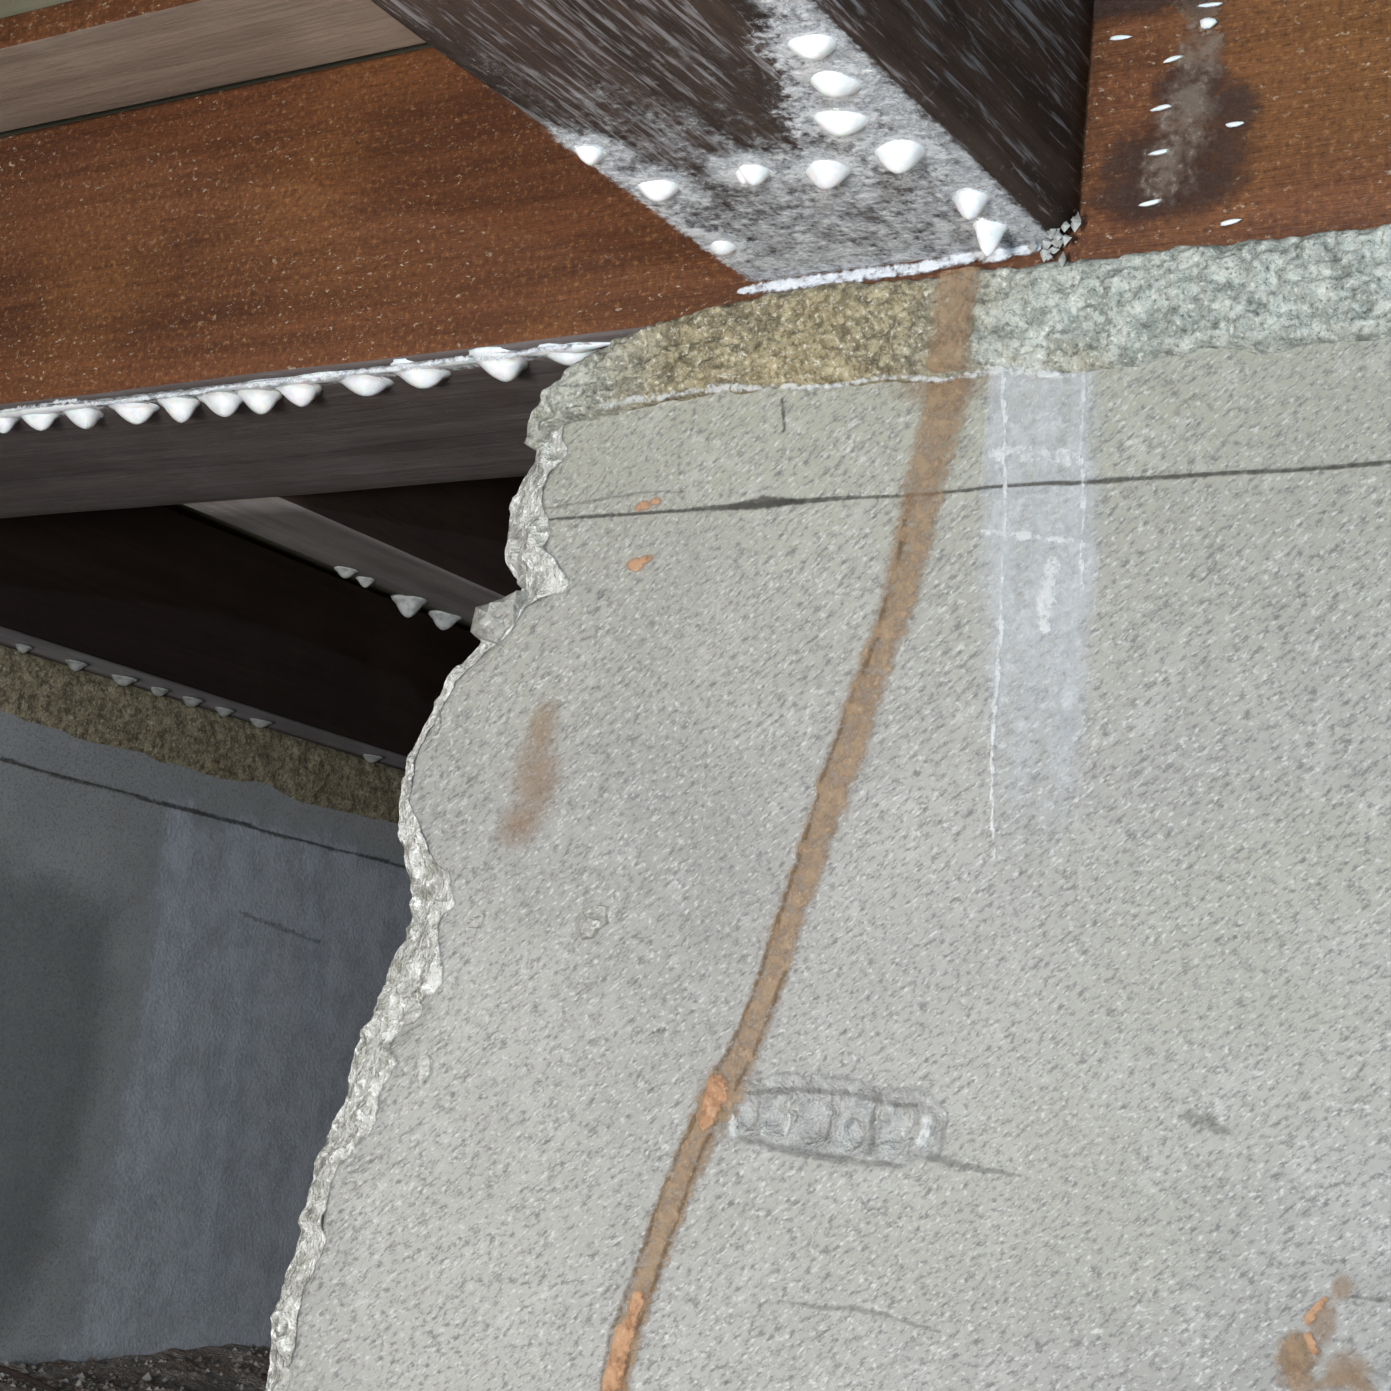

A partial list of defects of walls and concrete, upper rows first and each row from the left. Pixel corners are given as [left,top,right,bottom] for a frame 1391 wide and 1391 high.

water stain [1093,0,1257,222]
water stain [986,371,1086,584]
rust [627,555,652,572]
water stain [1038,560,1057,632]
water stain [990,660,1000,858]
crack [548,267,1391,1391]
spalling [717,1073,947,1168]
rust [1277,1283,1367,1391]
spalling [1332,1369,1391,1391]